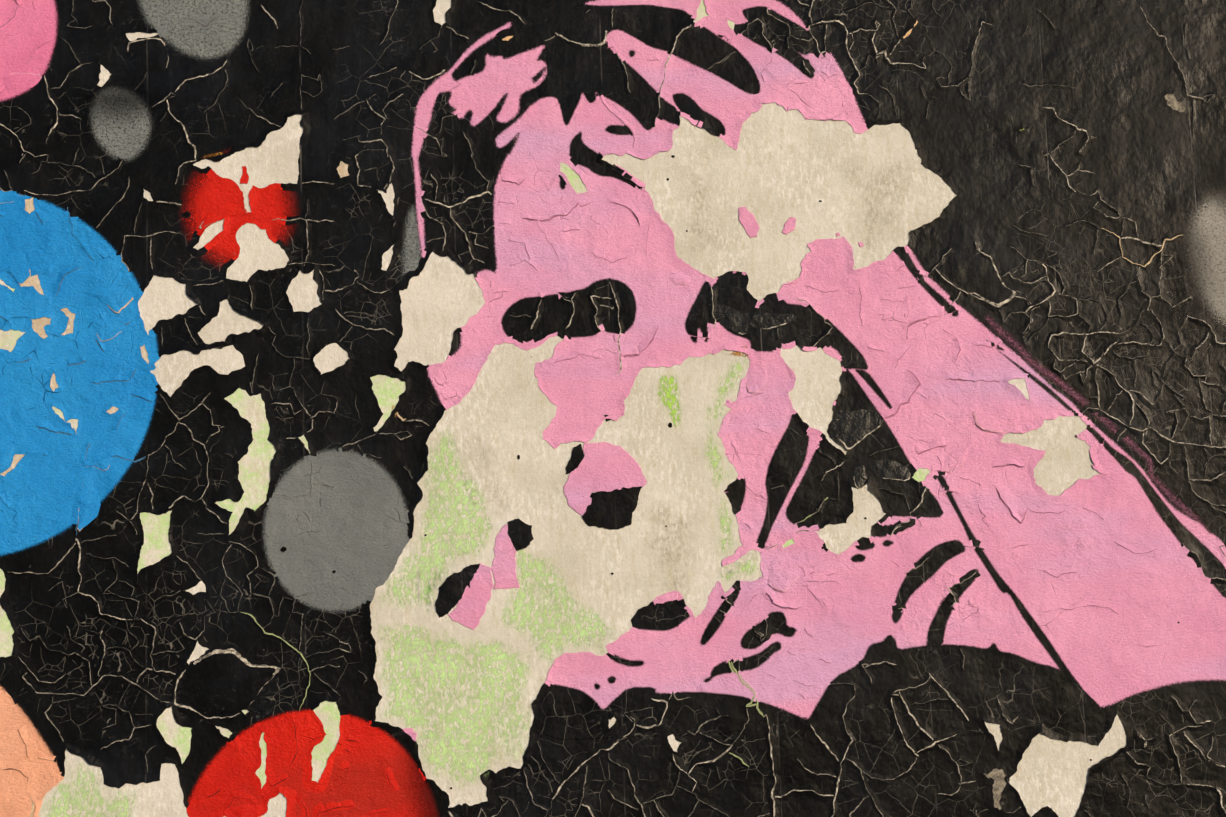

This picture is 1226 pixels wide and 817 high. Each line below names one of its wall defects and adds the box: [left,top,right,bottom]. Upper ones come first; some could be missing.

crack [474,0,995,149]
crack [1135,0,1215,145]
peeling [0,110,330,543]
peeling [309,178,491,443]
crack [0,0,724,817]
peeling [360,93,964,813]
crack [445,80,1226,817]
peeling [994,372,1114,504]
peeling [0,562,20,665]
peeling [126,502,181,589]
peeling [33,693,350,817]
peeling [977,706,1134,817]